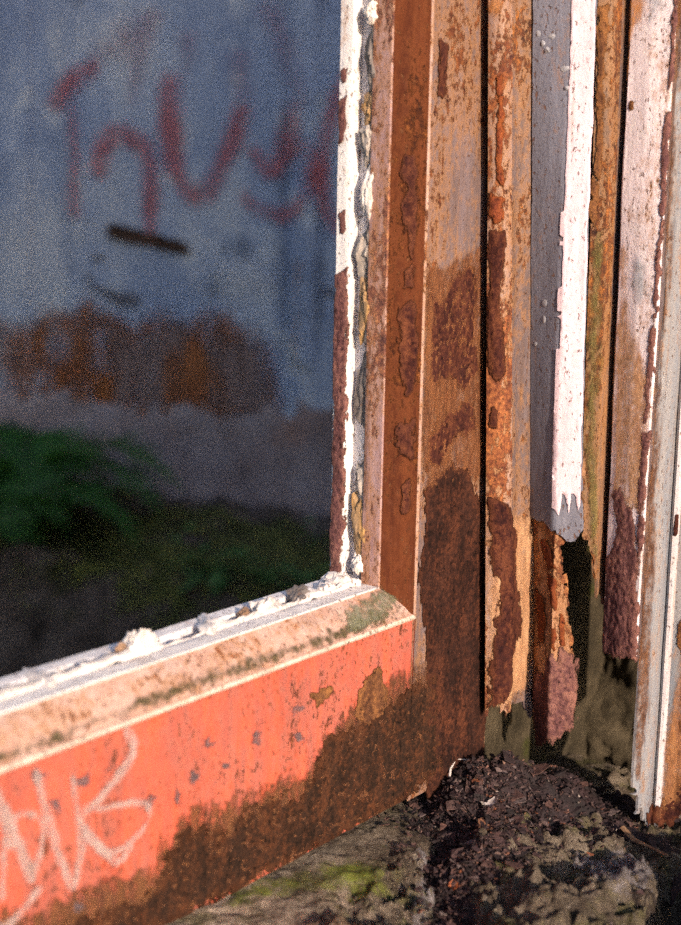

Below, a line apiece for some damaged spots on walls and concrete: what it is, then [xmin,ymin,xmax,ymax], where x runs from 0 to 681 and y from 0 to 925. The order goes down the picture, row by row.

peeling [536,30,555,54]
rust [629,0,643,42]
rust [668,0,681,90]
peeling [542,0,596,515]
rust [0,74,579,925]
peeling [73,773,90,787]
rust [646,680,681,828]